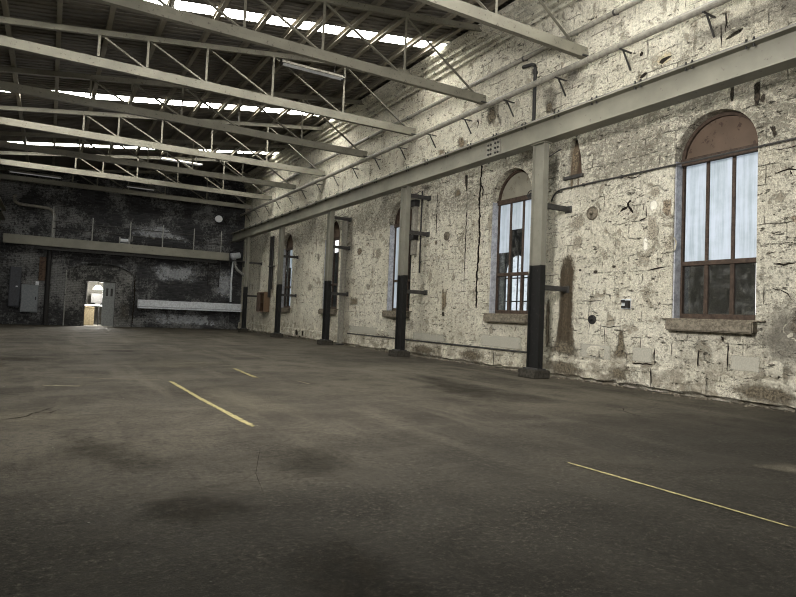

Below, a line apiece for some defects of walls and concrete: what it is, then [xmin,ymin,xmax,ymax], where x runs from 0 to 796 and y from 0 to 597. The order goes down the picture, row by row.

corrosion [570,148,579,189]
crack [463,165,484,308]
corrosion [545,256,583,375]